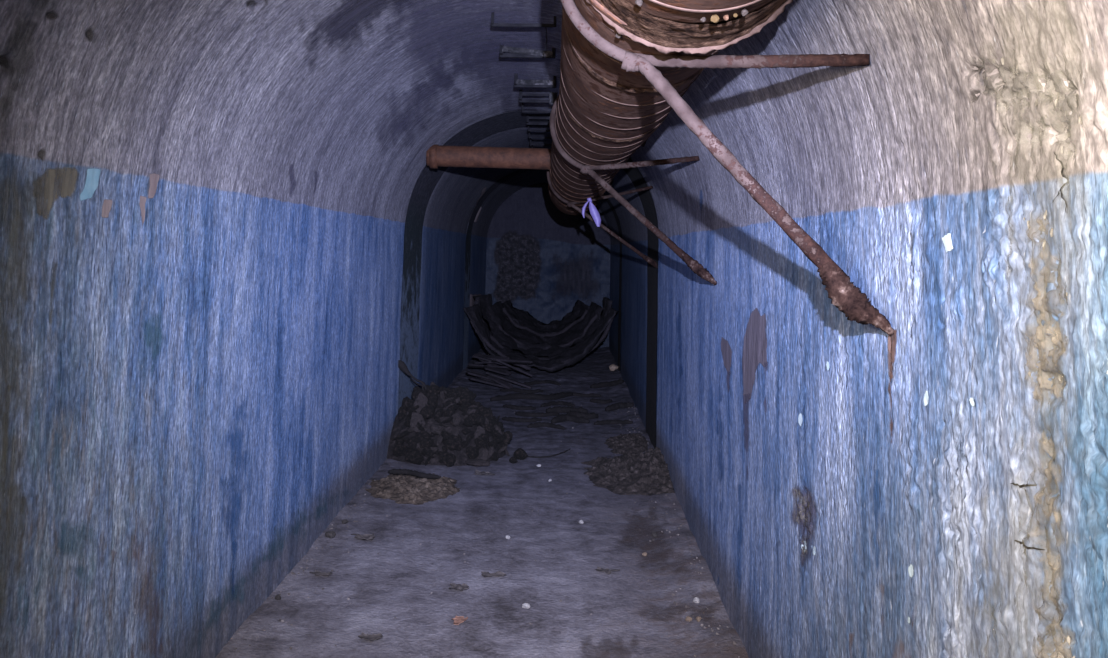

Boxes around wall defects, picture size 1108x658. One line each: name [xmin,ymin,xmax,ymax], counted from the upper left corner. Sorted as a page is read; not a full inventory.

leakage [301,0,561,139]
spalling [973,57,1082,156]
peeling [33,149,113,219]
peeling [139,173,160,224]
crack [1010,483,1037,492]
leakage [792,489,816,564]
crack [1014,540,1045,553]